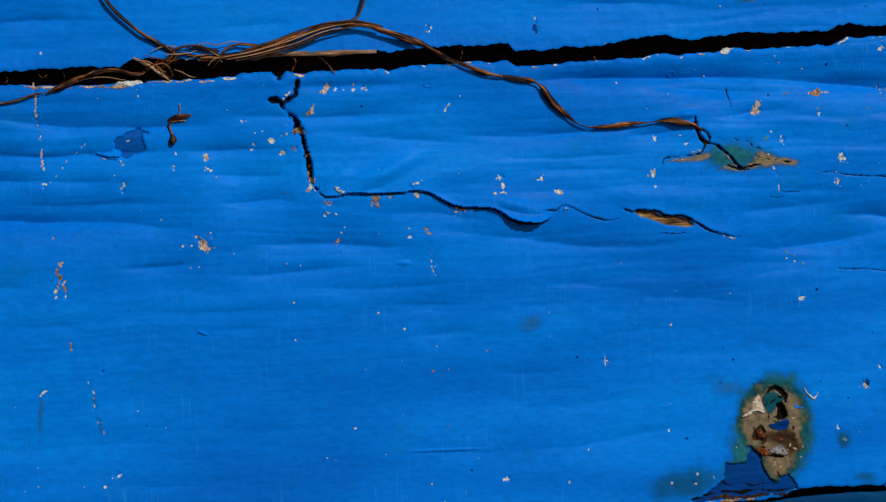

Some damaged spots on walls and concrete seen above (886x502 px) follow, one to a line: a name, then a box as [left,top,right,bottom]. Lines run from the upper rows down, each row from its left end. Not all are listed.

crack [268,70,318,191]
crack [662,117,791,171]
peeling [834,152,886,185]
crack [546,205,615,220]
peeling [621,208,740,239]
peeling [692,382,818,502]